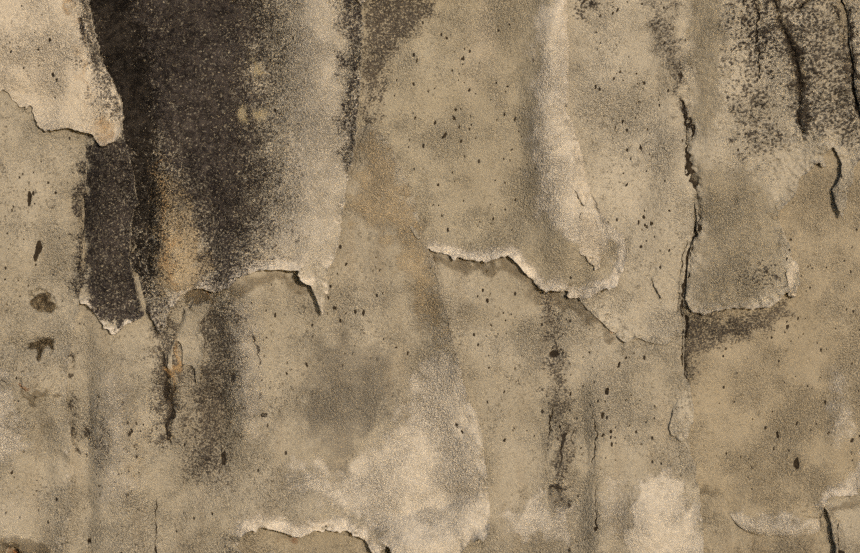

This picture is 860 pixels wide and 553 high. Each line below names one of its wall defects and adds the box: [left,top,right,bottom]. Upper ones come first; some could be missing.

flaking render [119,0,198,125]
leakage [526,0,625,248]
leakage [645,0,860,169]
crack [754,0,809,138]
crack [841,0,859,115]
leakage [67,0,449,504]
crack [677,99,702,380]
leakage [696,170,787,306]
leakage [285,352,490,553]
leakage [730,511,821,537]